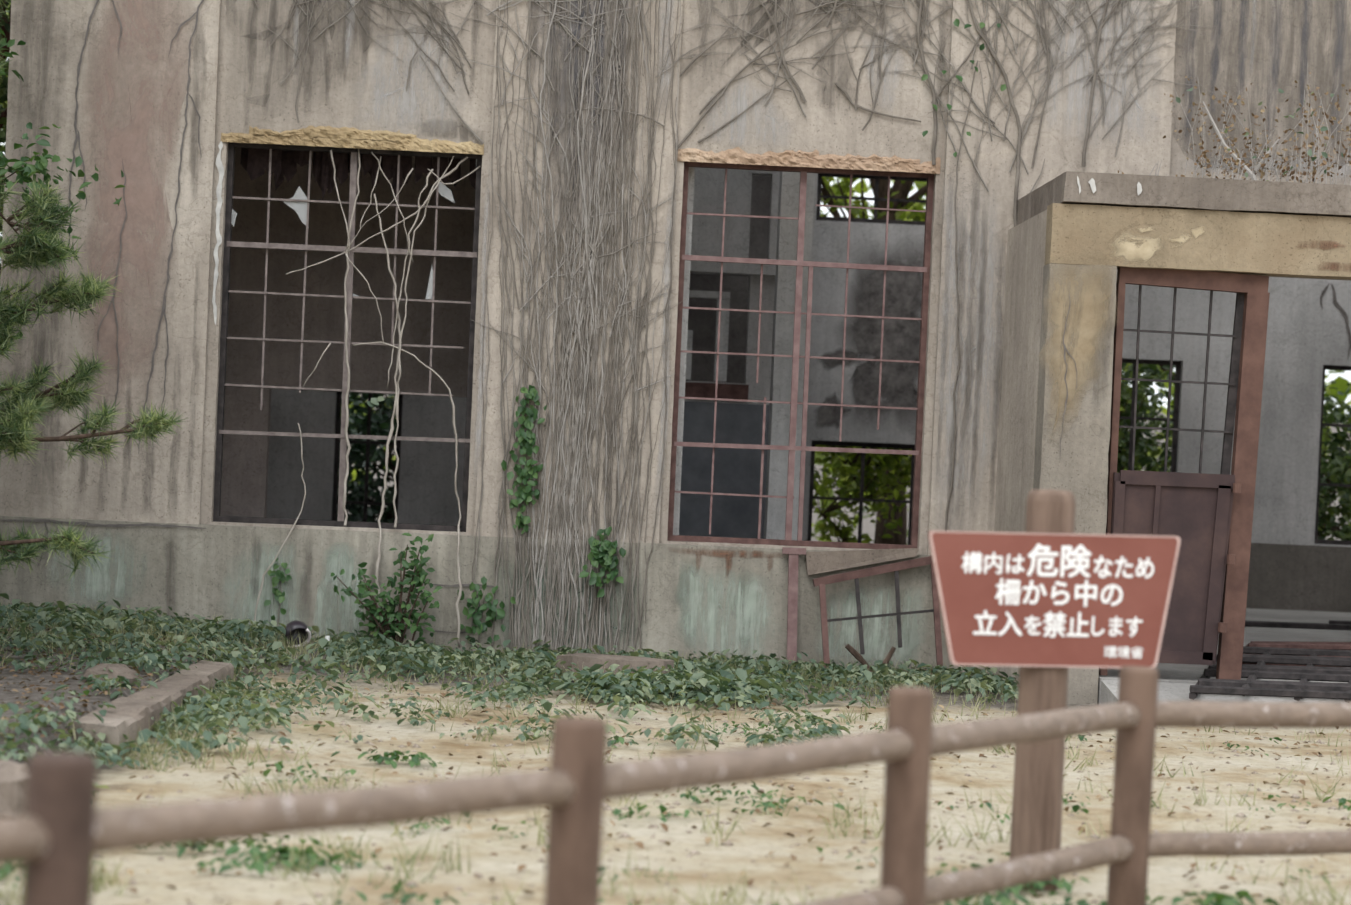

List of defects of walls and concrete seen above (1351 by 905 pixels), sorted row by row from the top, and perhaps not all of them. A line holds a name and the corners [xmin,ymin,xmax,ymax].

water stain [1182,0,1350,168]
peeling [1115,227,1204,261]
crack [1320,283,1351,359]